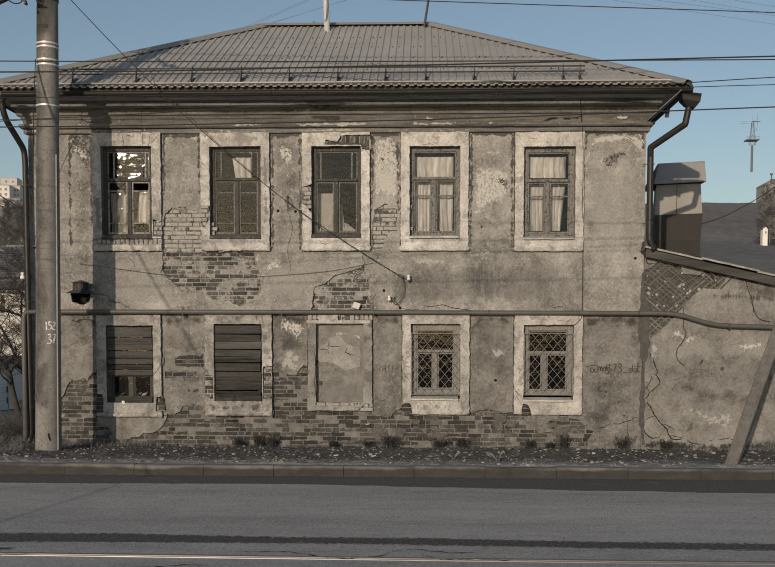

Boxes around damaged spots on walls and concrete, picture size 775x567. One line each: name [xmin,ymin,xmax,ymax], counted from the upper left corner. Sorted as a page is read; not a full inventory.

spalling [93,149,281,308]
spalling [294,101,413,252]
spalling [61,266,595,449]
crack [601,354,733,445]
spalling [643,262,727,358]